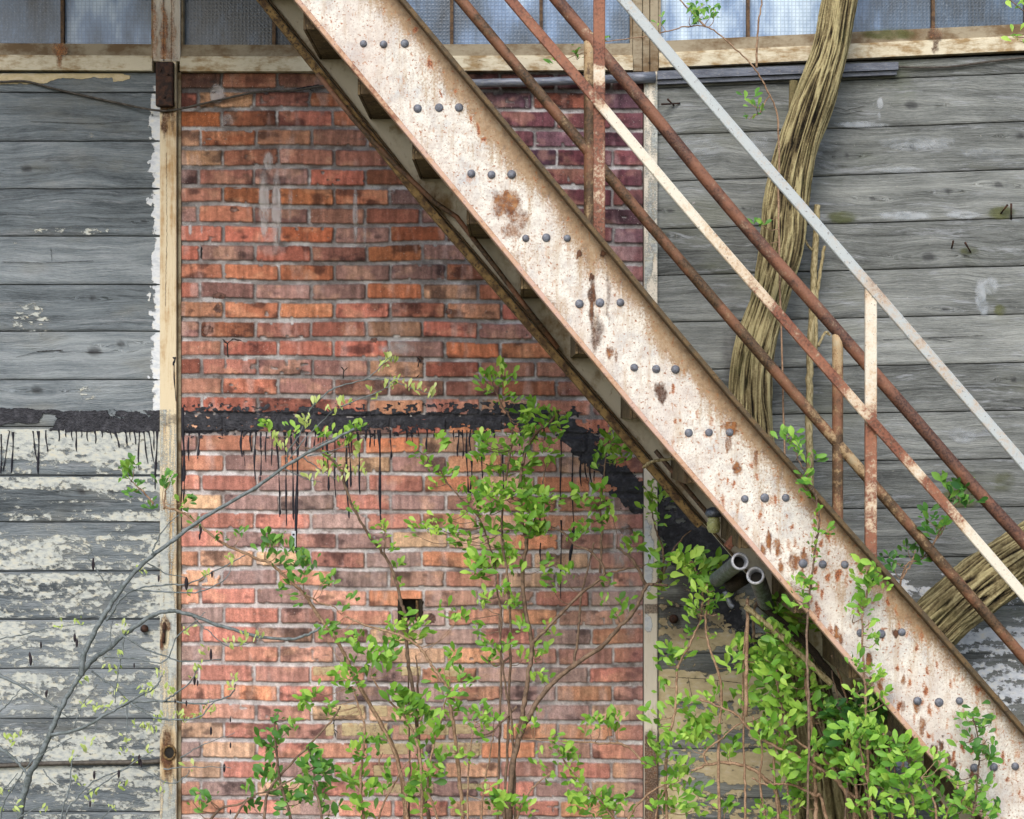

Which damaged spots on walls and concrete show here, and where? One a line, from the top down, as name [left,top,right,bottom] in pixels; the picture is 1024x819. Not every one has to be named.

corrosion [494,190,528,237]
corrosion [588,273,617,358]
corrosion [654,384,667,404]
peeling [0,86,176,819]
corrosion [723,422,737,451]
corrosion [761,530,808,583]
peeling [891,573,931,597]
peeling [956,598,1024,711]